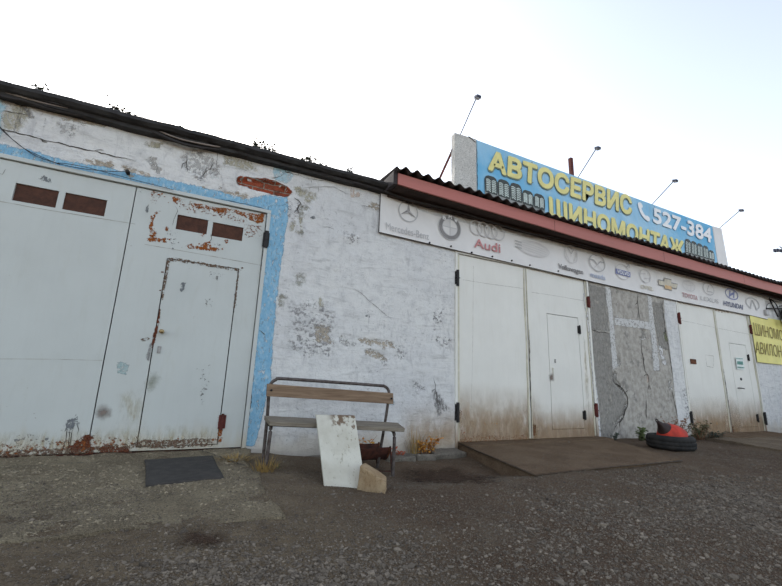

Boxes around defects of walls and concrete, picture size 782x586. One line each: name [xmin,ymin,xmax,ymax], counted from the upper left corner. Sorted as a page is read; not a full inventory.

flaking render [182,150,298,217]
rust [147,191,265,243]
rust [187,242,218,252]
rust [159,258,243,308]
peeling [291,304,395,361]
peeling [583,280,679,439]
crack [613,340,651,429]
rust [0,429,223,457]